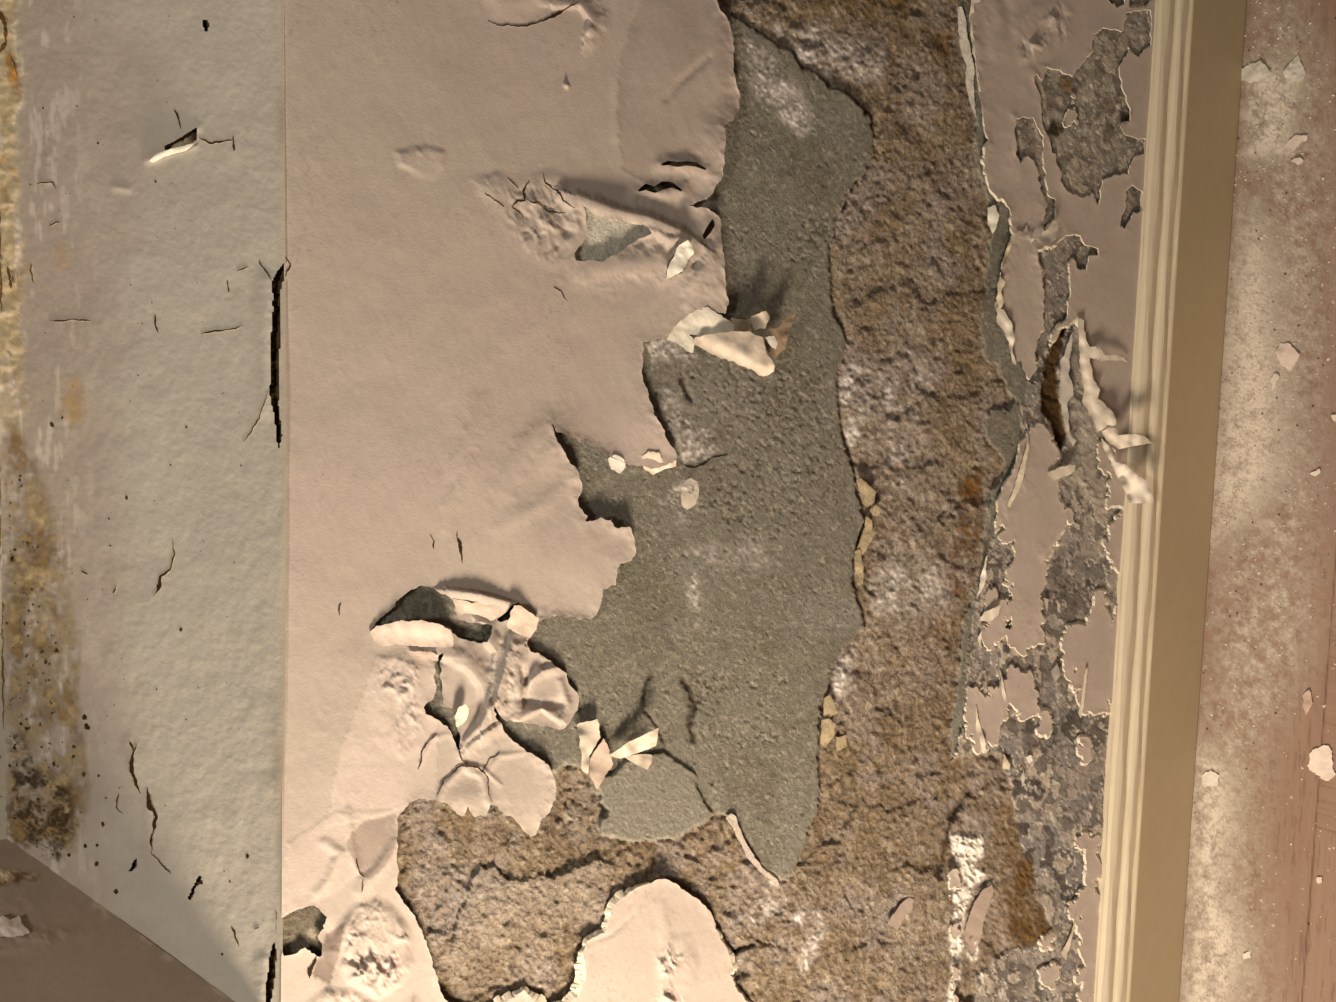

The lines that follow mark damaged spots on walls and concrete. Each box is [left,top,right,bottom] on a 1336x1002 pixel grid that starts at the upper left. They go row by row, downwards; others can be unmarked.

crack [0,11,18,77]
crack [488,2,579,28]
crack [174,110,236,151]
crack [0,213,34,312]
crack [52,316,91,324]
crack [152,315,160,333]
crack [201,257,291,448]
flaking render [364,0,1153,1002]
crack [153,541,176,597]
mould [5,429,90,860]
crack [115,742,171,874]